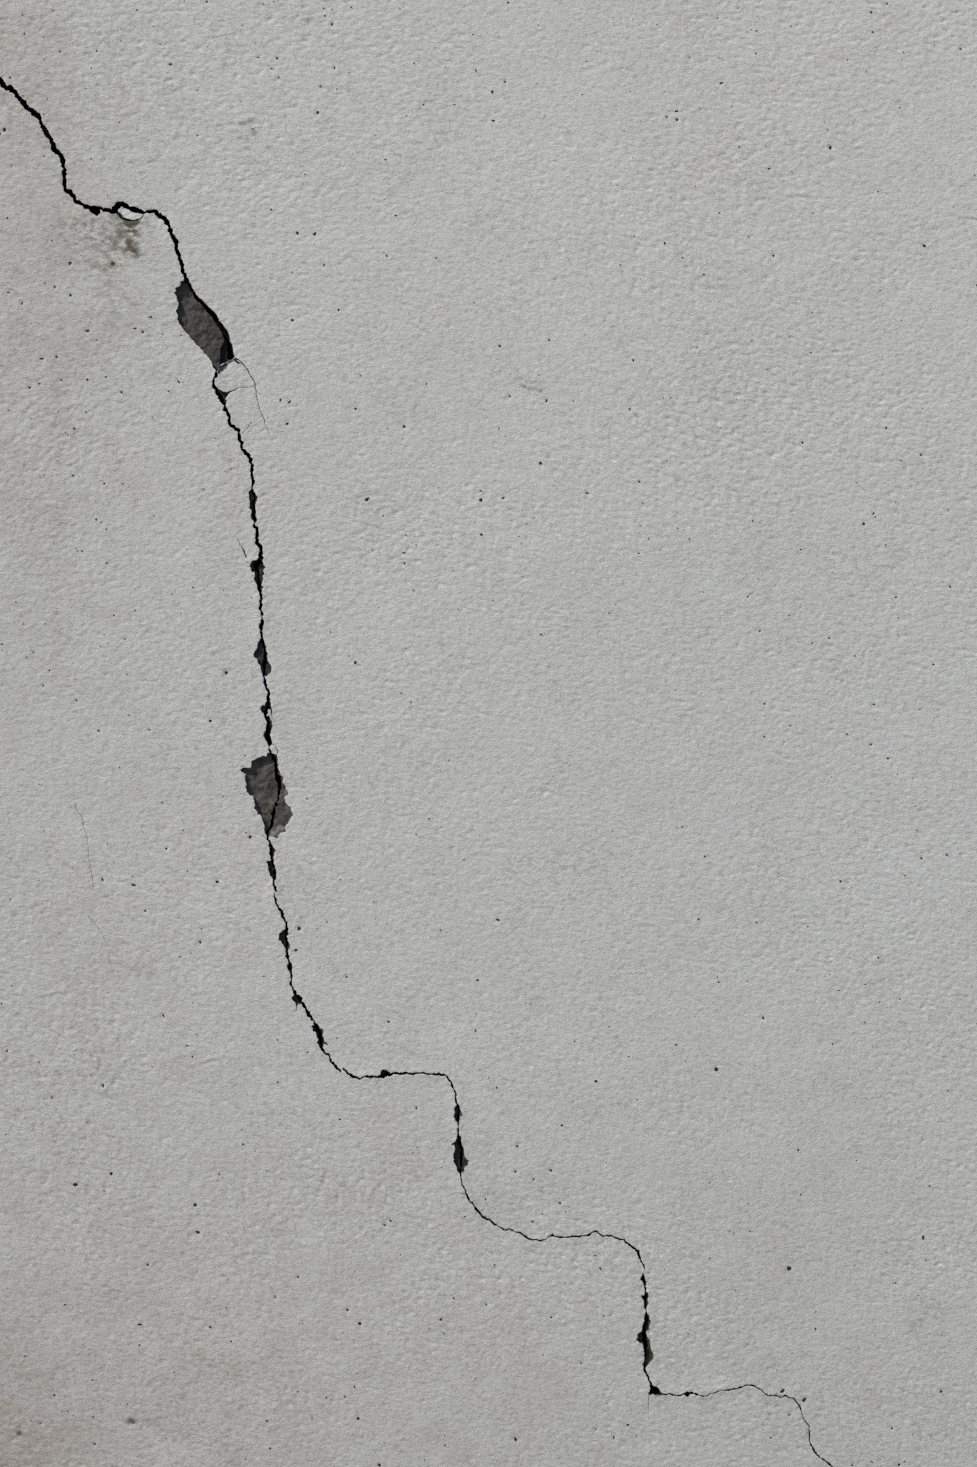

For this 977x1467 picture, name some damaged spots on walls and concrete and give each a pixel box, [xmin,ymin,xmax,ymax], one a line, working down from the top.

crack [0,77,269,431]
spalling [174,281,241,405]
spalling [240,701,293,880]
crack [212,370,833,1467]